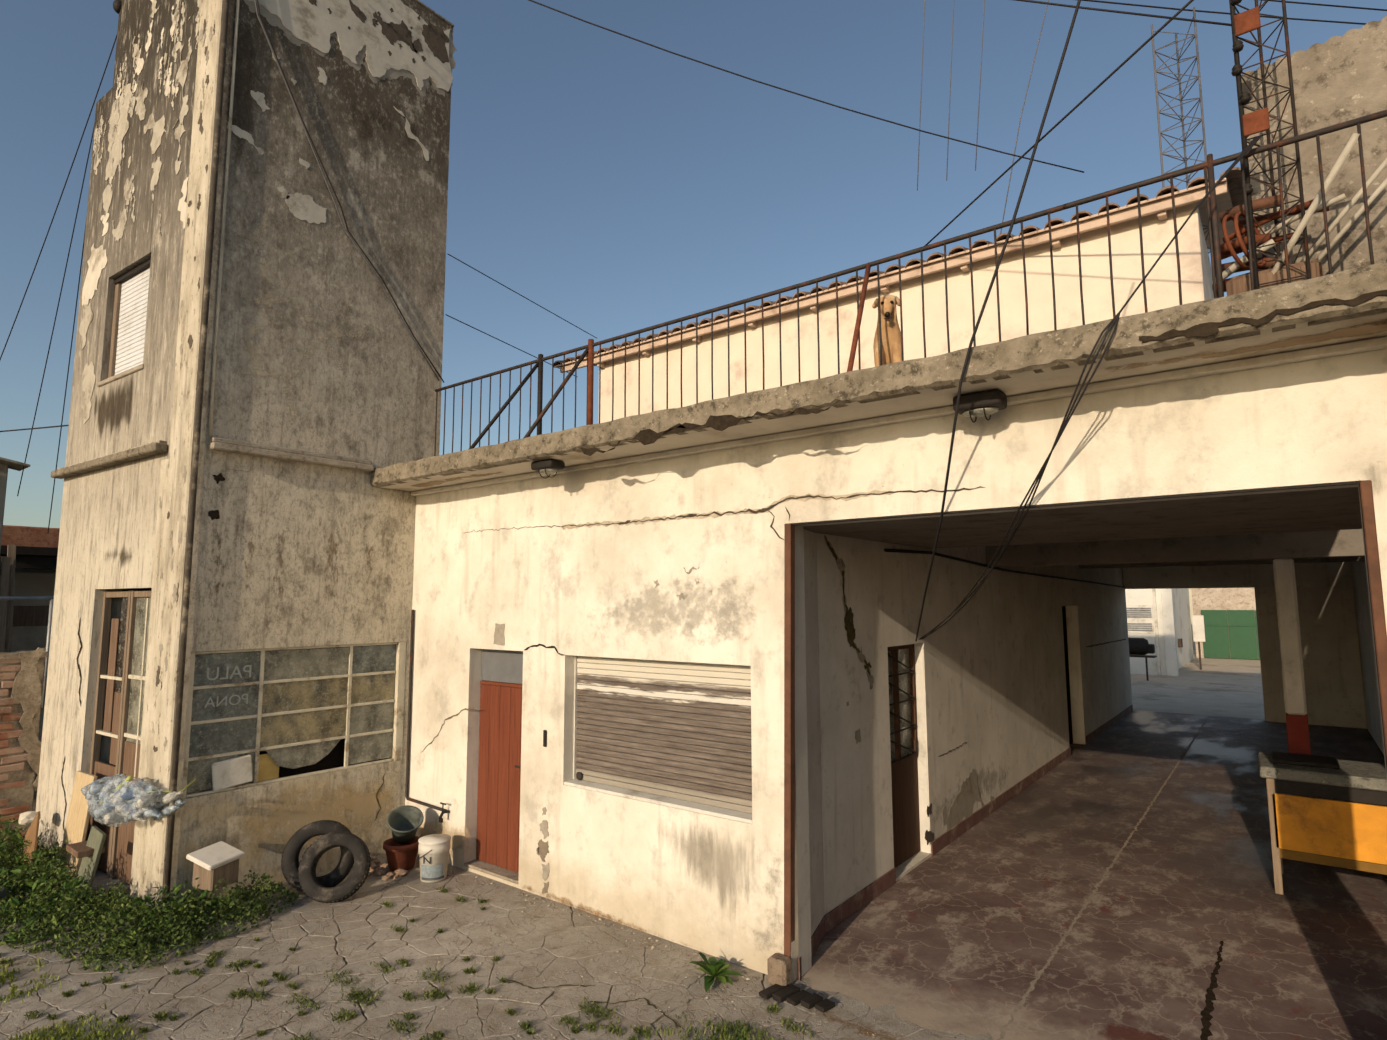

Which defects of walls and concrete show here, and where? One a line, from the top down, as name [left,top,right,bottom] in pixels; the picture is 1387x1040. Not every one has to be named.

peeling [244,0,457,97]
peeling [79,0,215,424]
peeling [277,186,327,224]
spalling [1139,323,1219,342]
spalling [580,401,838,456]
crack [466,486,986,540]
crack [824,535,874,690]
crack [421,708,475,753]
peeling [536,808,549,894]
crack [997,721,1206,1040]
crack [506,979,685,1030]
crack [1200,941,1224,1040]